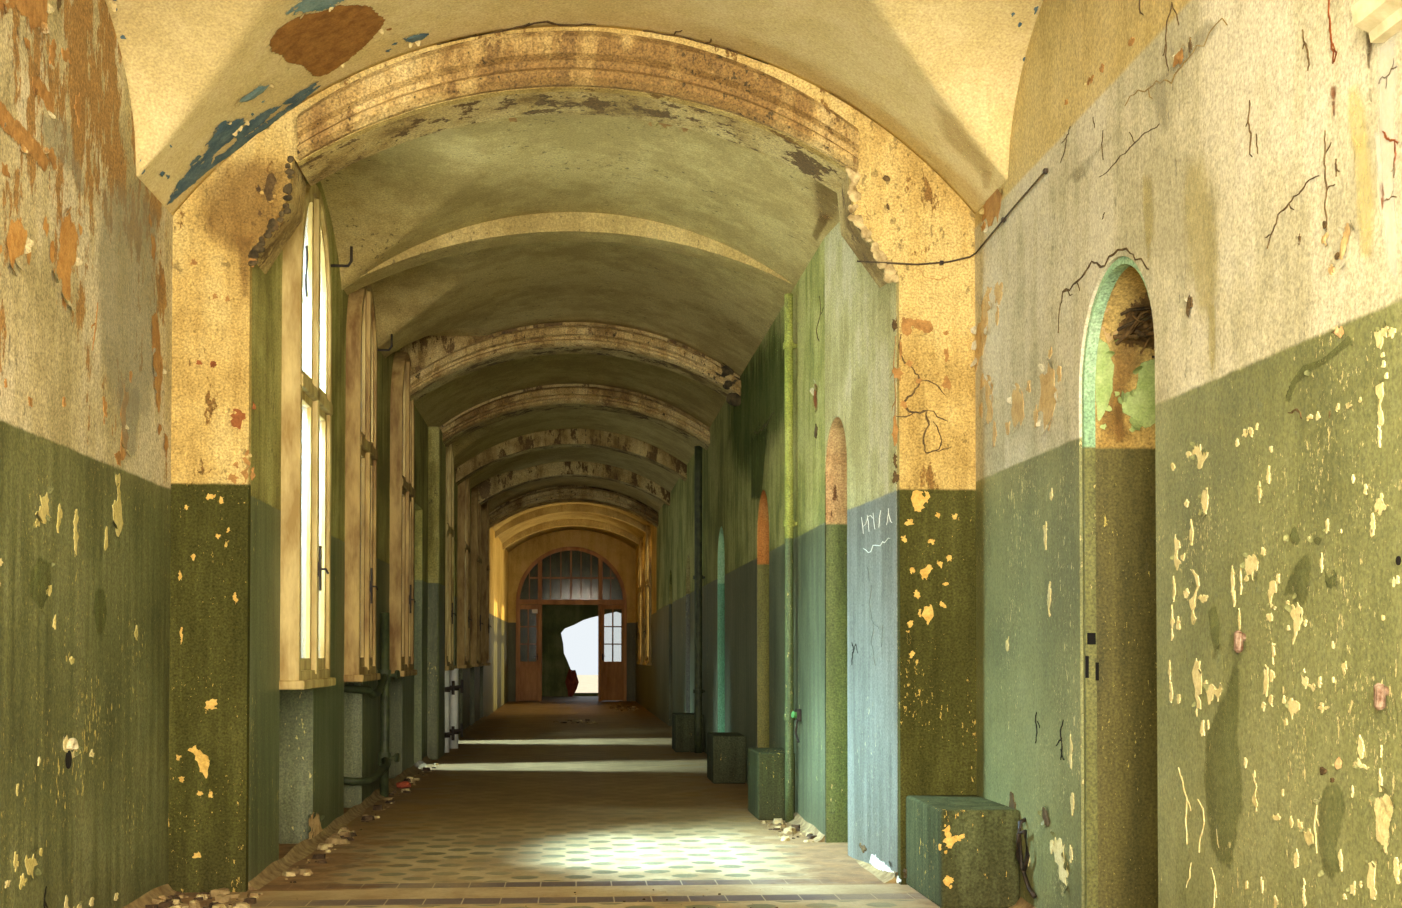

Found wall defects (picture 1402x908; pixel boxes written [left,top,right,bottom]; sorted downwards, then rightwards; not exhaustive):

peeling [139,0,429,287]
crack [1060,0,1227,177]
crack [1265,130,1339,249]
crack [1302,0,1337,71]
crack [1058,247,1149,333]
crack [890,334,951,454]
peeling [1090,292,1155,432]
peeling [906,555,952,658]
peeling [1170,487,1209,641]
peeling [1231,547,1307,644]
peeling [1168,658,1223,737]
peeling [1320,735,1402,900]